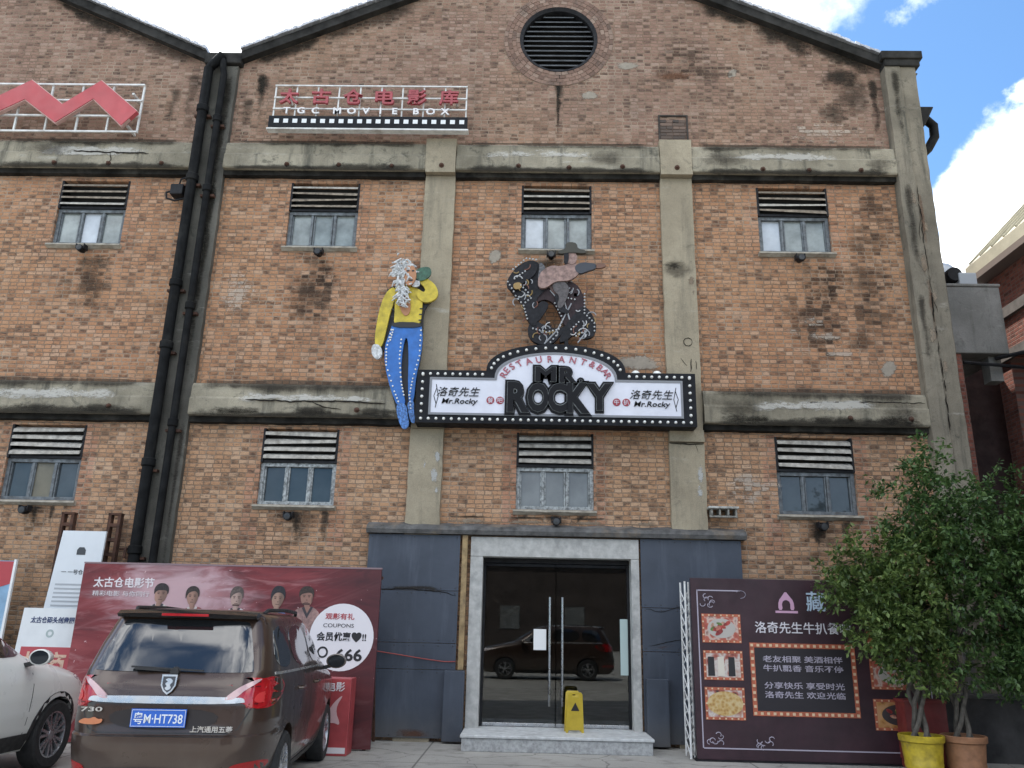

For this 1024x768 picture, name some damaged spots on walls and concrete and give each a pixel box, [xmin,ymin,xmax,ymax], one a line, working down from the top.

damp [706,5,745,24]
damp [757,25,877,109]
damp [245,75,268,106]
crack [74,150,148,161]
crack [807,188,951,430]
crack [245,399,385,410]